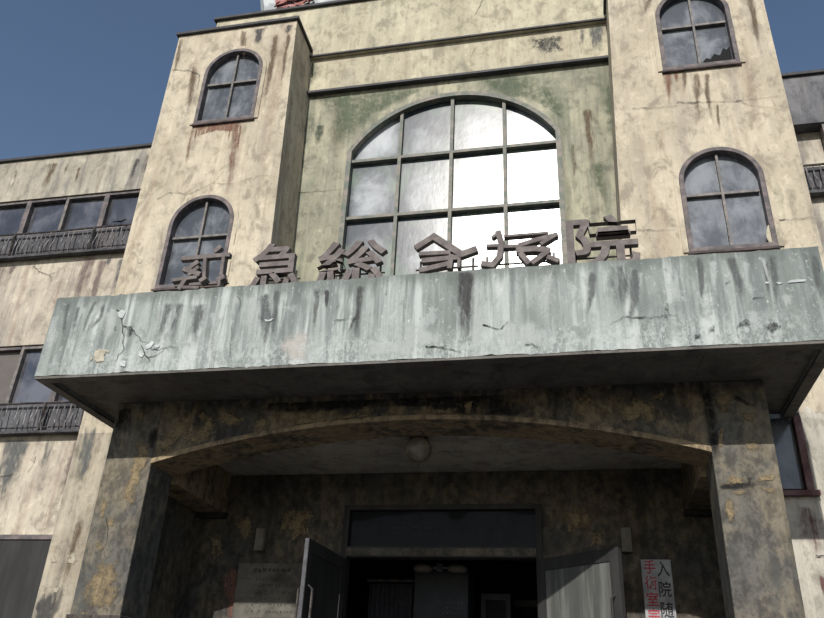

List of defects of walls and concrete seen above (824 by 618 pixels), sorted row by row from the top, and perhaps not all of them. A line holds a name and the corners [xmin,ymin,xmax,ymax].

rust [188,123,241,166]
leakage [584,110,593,148]
leakage [697,258,716,295]
leakage [729,259,752,292]
leakage [762,258,777,287]
crack [115,309,174,361]
leakage [236,292,278,337]
leakage [350,287,362,328]
leakage [459,272,483,350]
leakage [0,440,28,493]
leakage [63,430,95,485]
leakage [67,525,81,570]